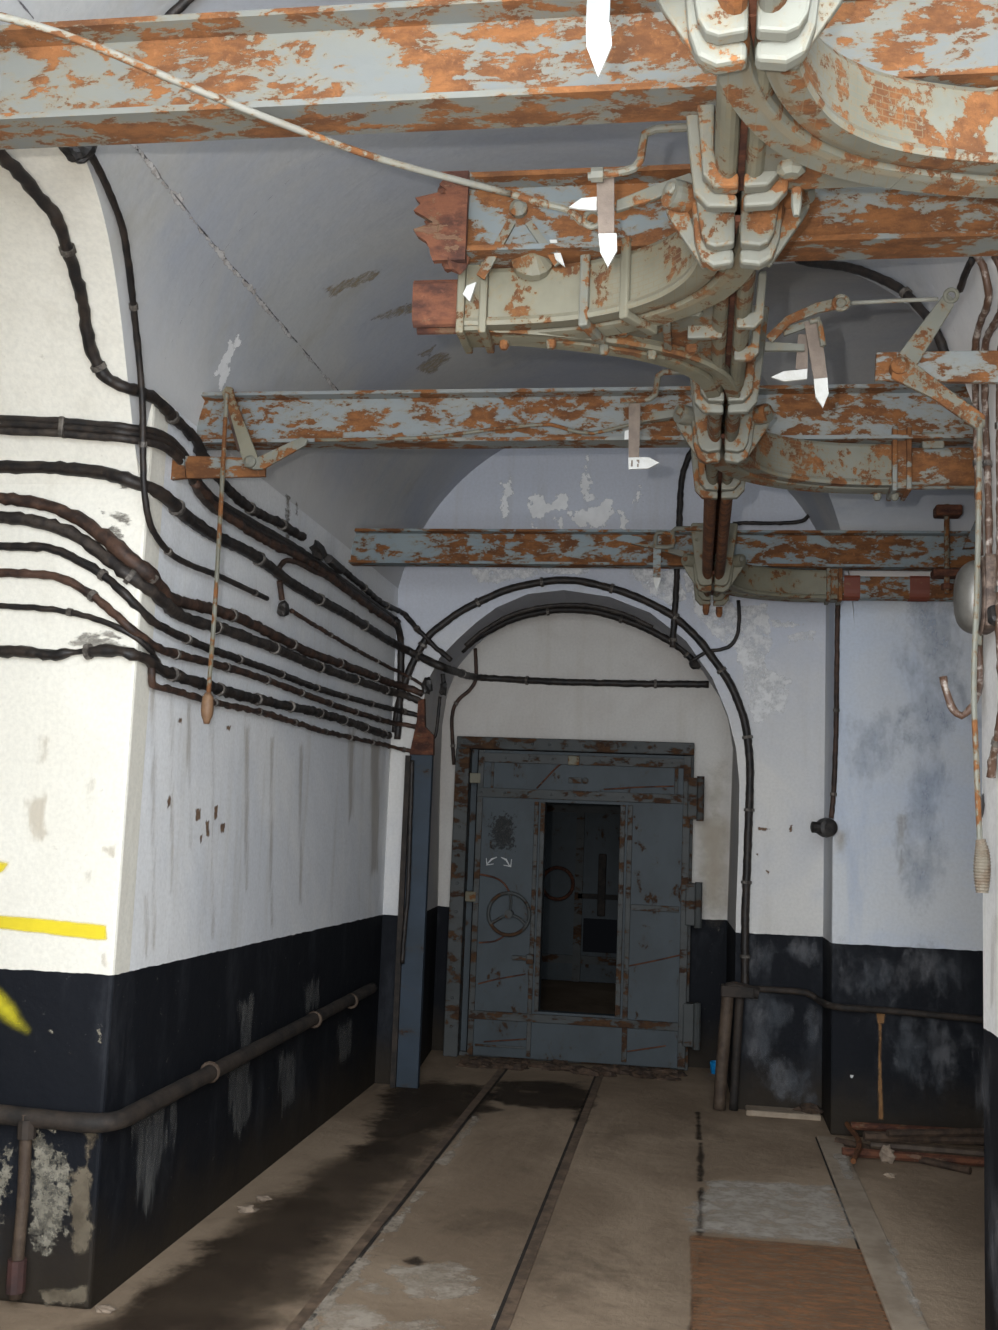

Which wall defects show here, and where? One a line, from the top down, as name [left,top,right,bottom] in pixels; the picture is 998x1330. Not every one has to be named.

peeling [499,455,642,529]
peeling [0,1149,13,1205]
peeling [27,1128,98,1256]
water stain [85,1081,593,1330]